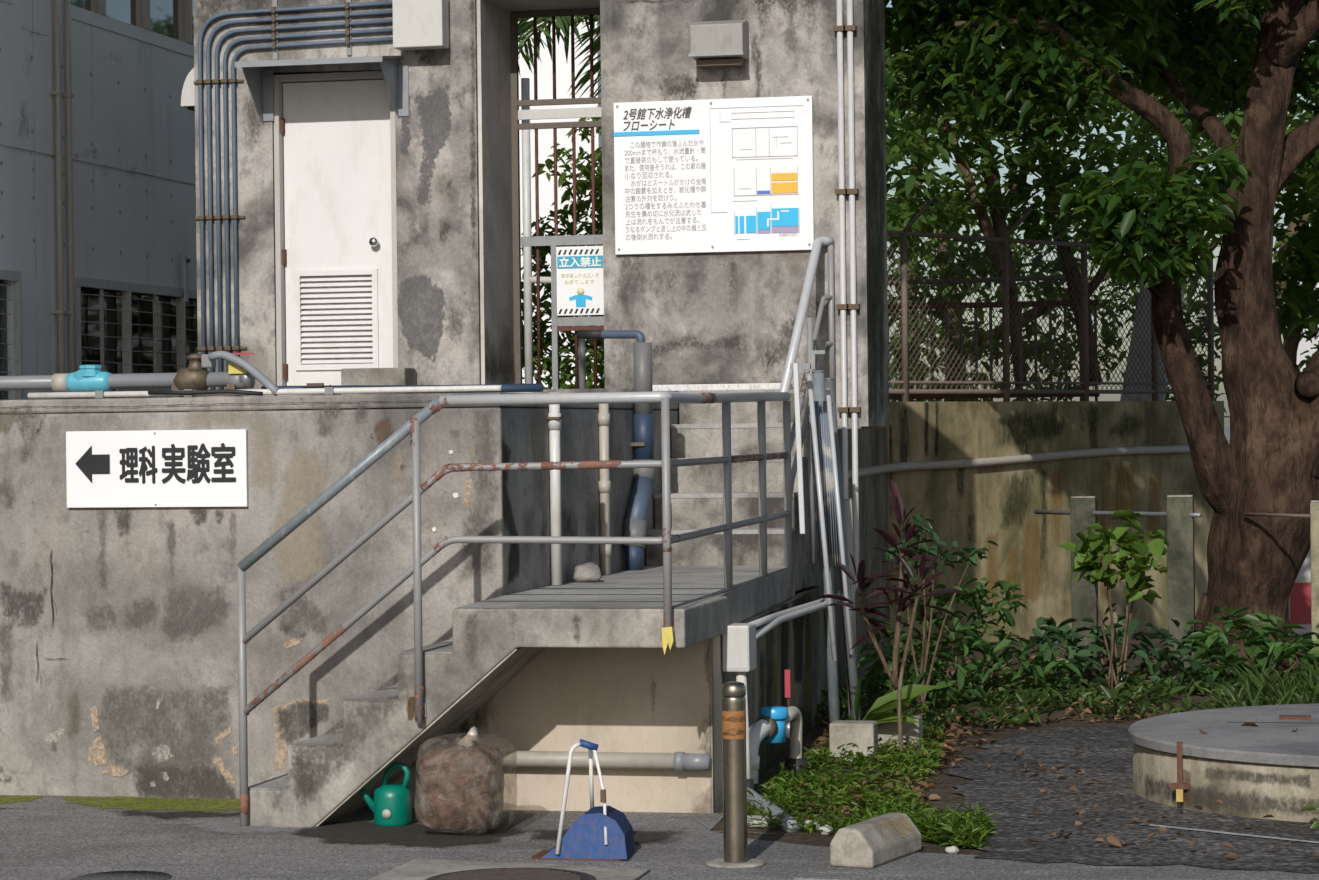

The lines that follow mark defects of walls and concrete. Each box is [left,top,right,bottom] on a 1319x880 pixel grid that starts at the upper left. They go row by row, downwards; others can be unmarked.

water stain [400,40,475,205]
water stain [397,275,462,362]
rust [420,460,622,491]
rust [731,452,788,463]
water stain [1004,469,1047,559]
water stain [0,583,46,727]
rust [243,626,346,717]
water stain [101,690,273,834]
water stain [294,660,404,803]
water stain [442,711,485,744]
water stain [292,820,568,847]
water stain [633,831,681,843]